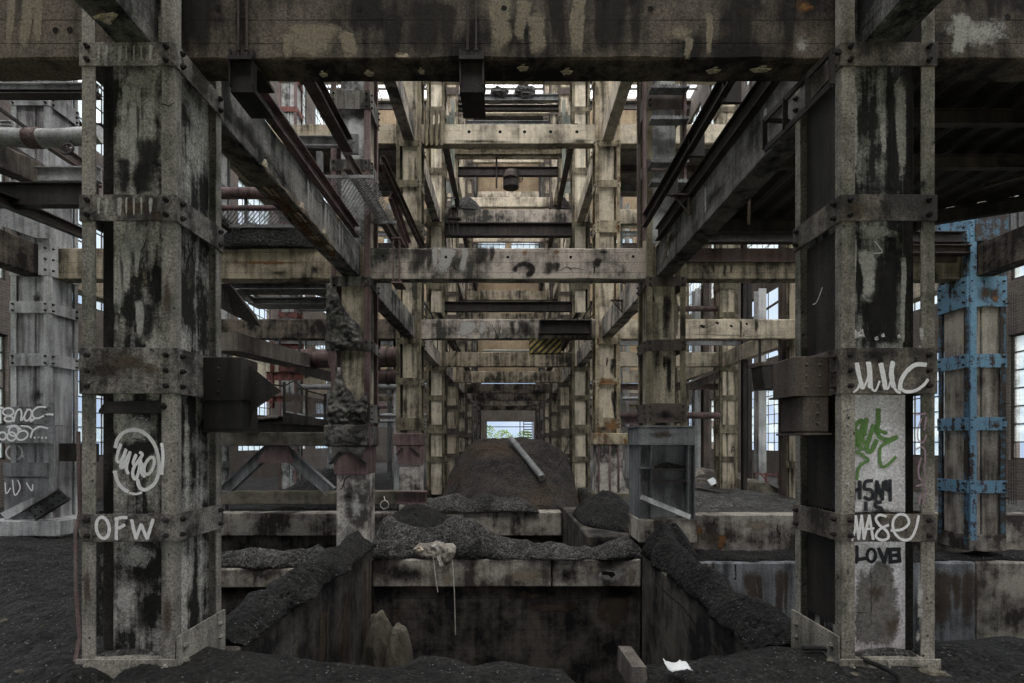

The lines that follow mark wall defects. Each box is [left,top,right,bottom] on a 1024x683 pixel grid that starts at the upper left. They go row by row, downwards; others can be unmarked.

water stain [283,24,357,57]
water stain [489,0,644,52]
water stain [671,27,693,57]
water stain [947,14,1005,52]
water stain [97,45,161,217]
water stain [880,83,906,189]
water stain [117,227,145,313]
water stain [855,209,907,342]
corrosion [980,288,999,302]
water stain [135,301,154,338]
water stain [122,546,153,566]
water stain [116,586,155,624]